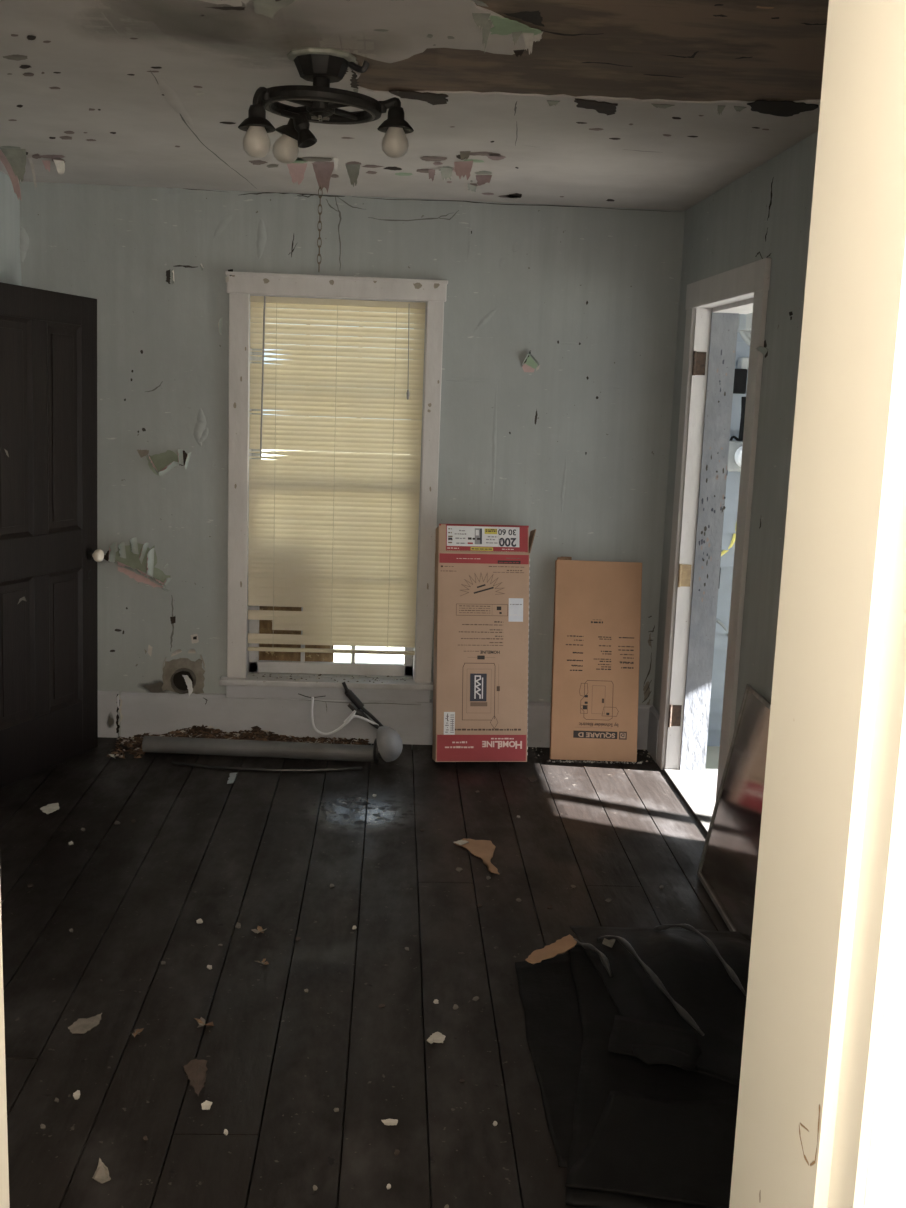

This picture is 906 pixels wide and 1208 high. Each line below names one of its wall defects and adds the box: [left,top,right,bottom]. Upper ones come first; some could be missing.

peeling [200,0,294,19]
flaking render [344,0,829,140]
peeling [0,146,66,201]
peeling [249,141,522,198]
crack [755,177,774,259]
peeling [137,449,191,477]
peeling [104,537,172,592]